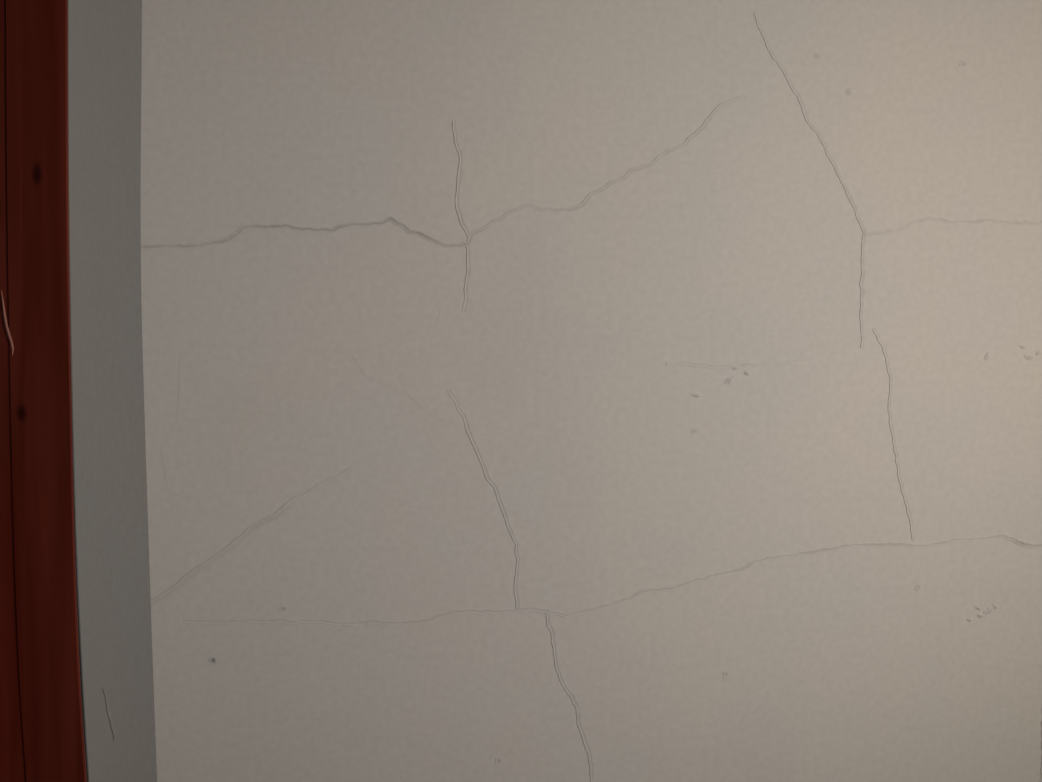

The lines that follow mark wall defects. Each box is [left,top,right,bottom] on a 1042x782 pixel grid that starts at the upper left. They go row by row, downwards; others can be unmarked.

crack [141,95,748,312]